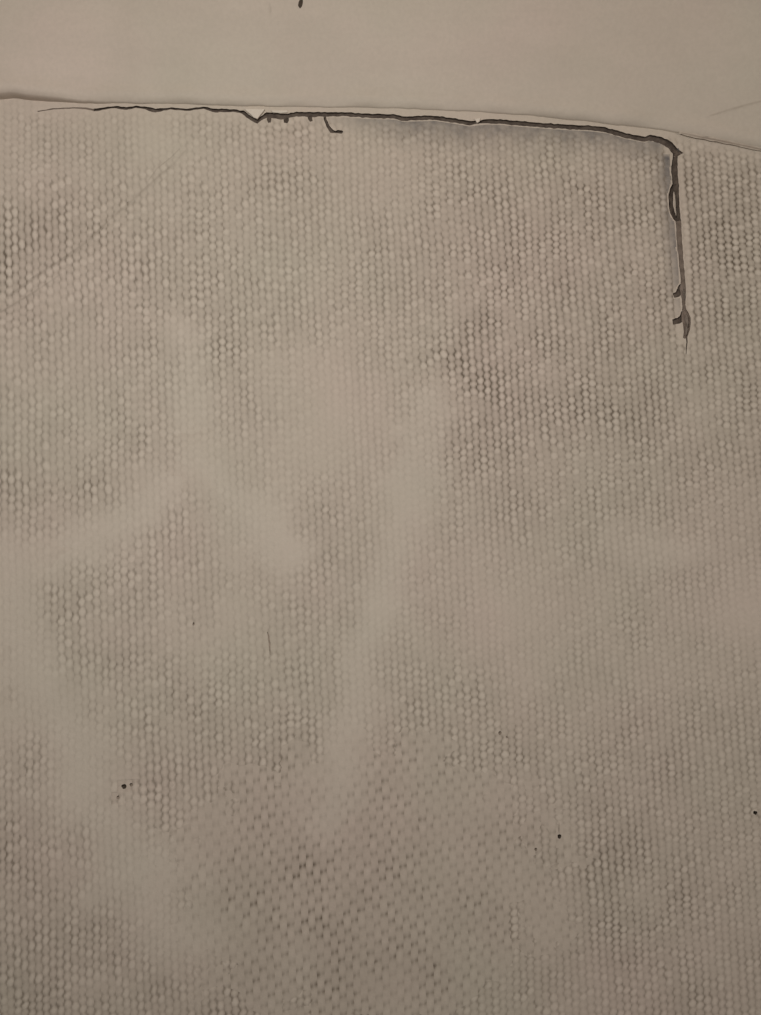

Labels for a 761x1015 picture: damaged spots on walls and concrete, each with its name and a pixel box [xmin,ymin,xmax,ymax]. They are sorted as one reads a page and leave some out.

crack [38,106,761,353]